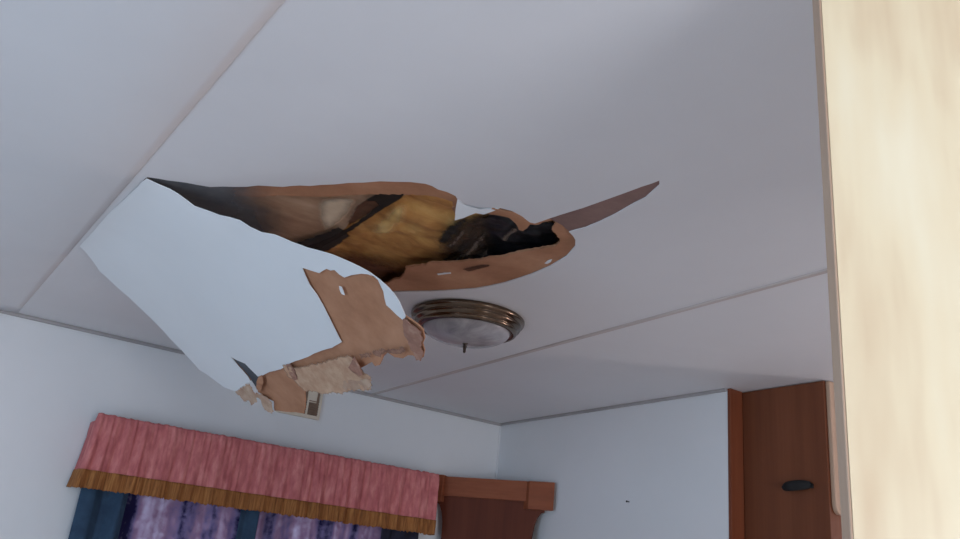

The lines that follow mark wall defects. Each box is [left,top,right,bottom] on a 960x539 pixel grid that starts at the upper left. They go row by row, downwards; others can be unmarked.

leakage [144,177,272,233]
leakage [322,199,350,226]
peeling [455,200,531,231]
peeling [550,181,659,231]
leakage [439,214,559,271]
leakage [339,255,402,282]